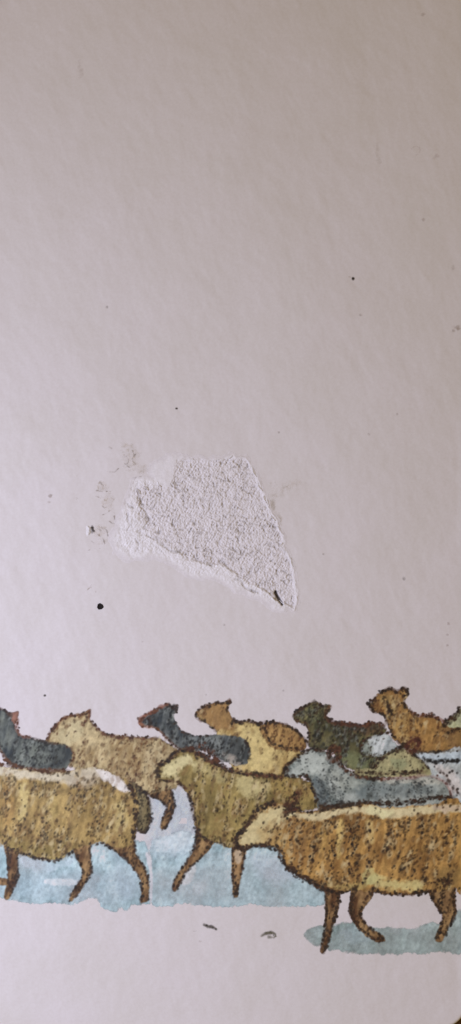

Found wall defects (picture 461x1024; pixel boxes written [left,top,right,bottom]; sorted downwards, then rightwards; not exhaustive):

peeling [108,451,301,613]